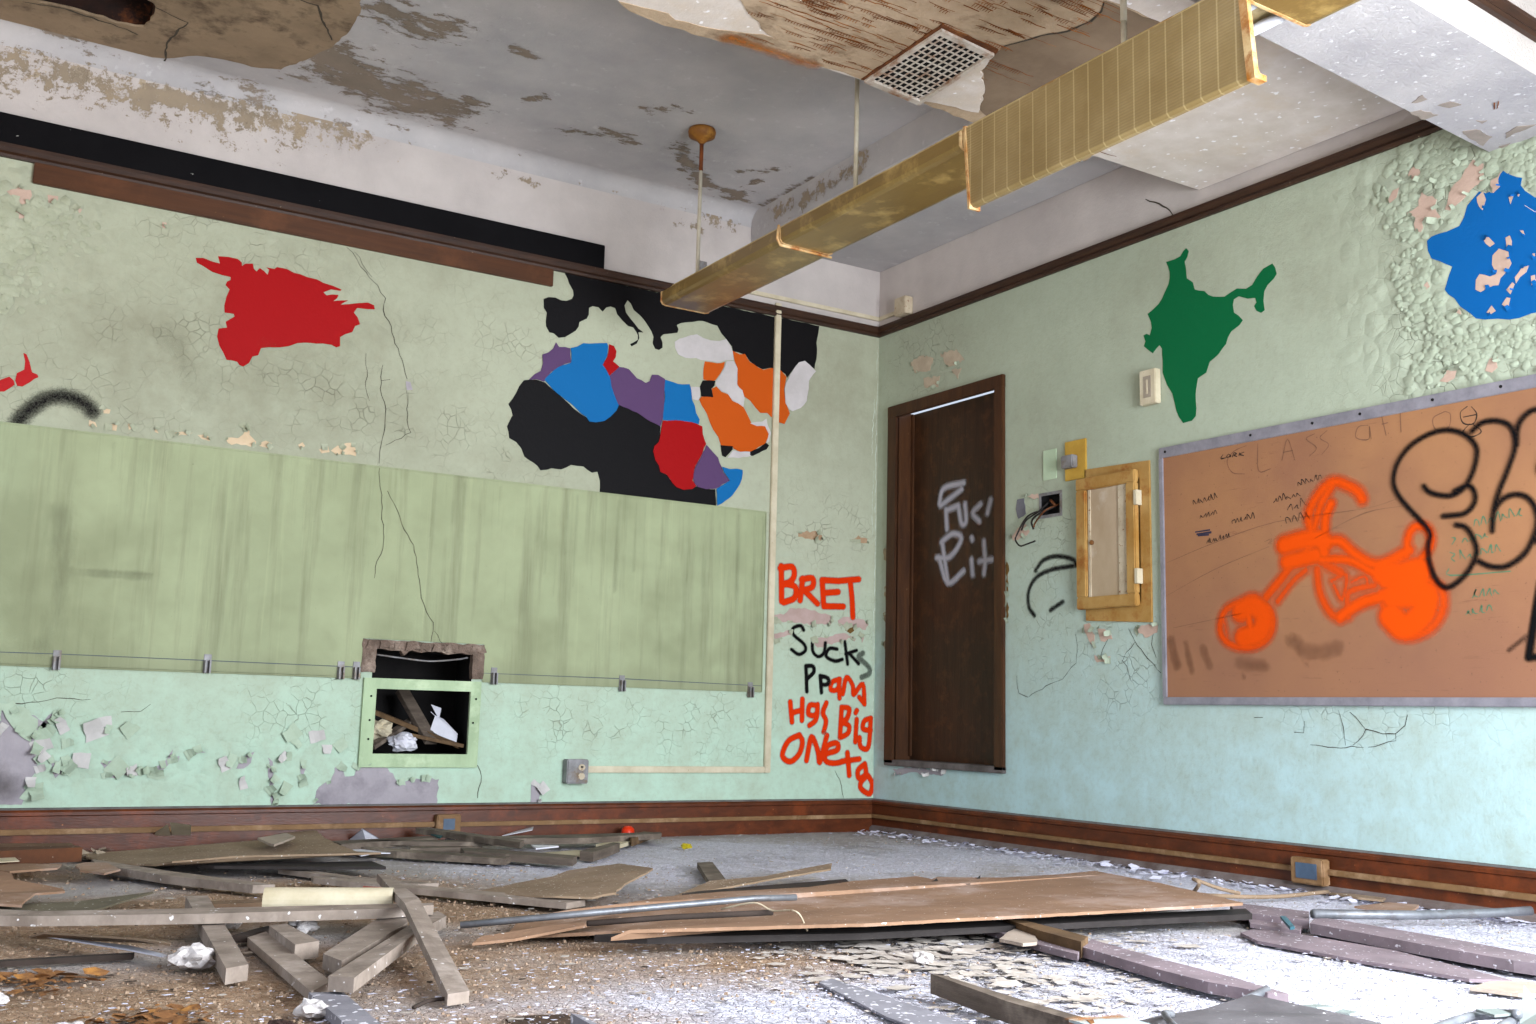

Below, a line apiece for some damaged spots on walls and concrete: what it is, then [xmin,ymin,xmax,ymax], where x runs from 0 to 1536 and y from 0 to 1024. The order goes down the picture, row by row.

peeling [0,44,379,166]
flaking render [0,0,498,131]
flaking render [619,0,1160,123]
peeling [1410,95,1462,120]
peeling [7,183,82,219]
peeling [1384,120,1536,234]
peeling [1475,230,1536,315]
peeling [1440,364,1466,382]
crack [349,249,442,643]
peeling [0,700,439,806]